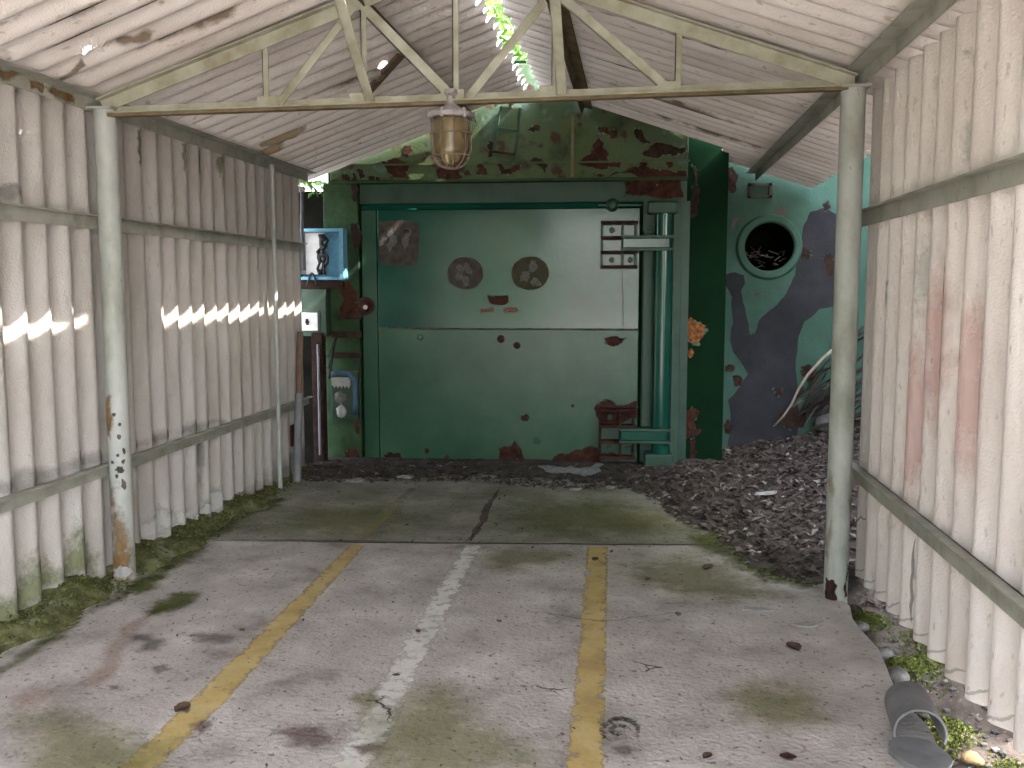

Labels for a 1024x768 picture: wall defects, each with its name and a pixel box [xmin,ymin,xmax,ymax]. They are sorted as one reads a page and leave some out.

corrosion [624,164,700,218]
corrosion [687,317,708,358]
corrosion [594,399,638,424]
corrosion [487,439,619,462]
corrosion [109,483,132,581]
crack [294,489,720,546]
water stain [0,530,89,622]
corrosion [825,564,849,601]
water stain [135,635,161,649]
water stain [196,634,231,642]